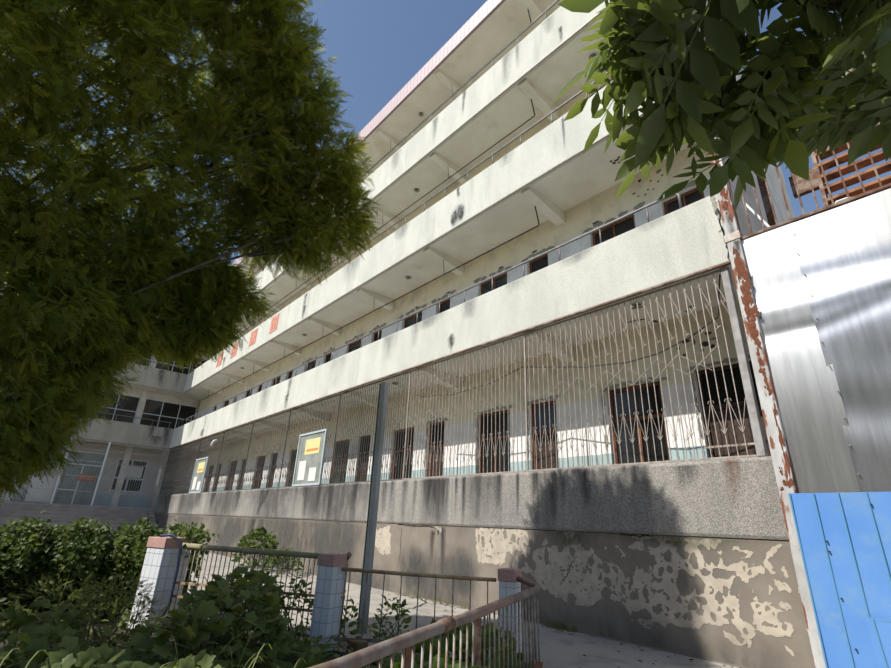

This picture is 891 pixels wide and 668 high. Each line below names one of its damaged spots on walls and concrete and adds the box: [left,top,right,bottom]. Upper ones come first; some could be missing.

corrosion [733,240,793,491]
damp [425,475,500,504]
peeling [475,527,800,656]